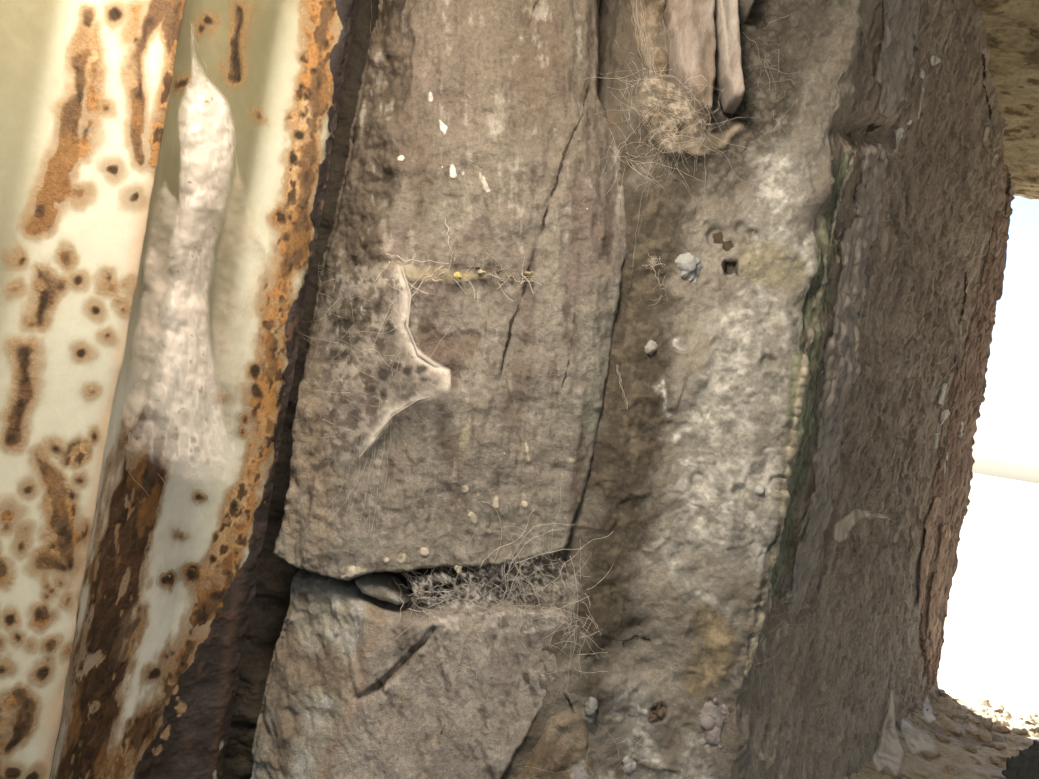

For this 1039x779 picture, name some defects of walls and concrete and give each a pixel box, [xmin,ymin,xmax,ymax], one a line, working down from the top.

crack [542,85,589,226]
crack [501,259,533,371]
corrosion [0,0,339,779]
crack [376,630,434,690]